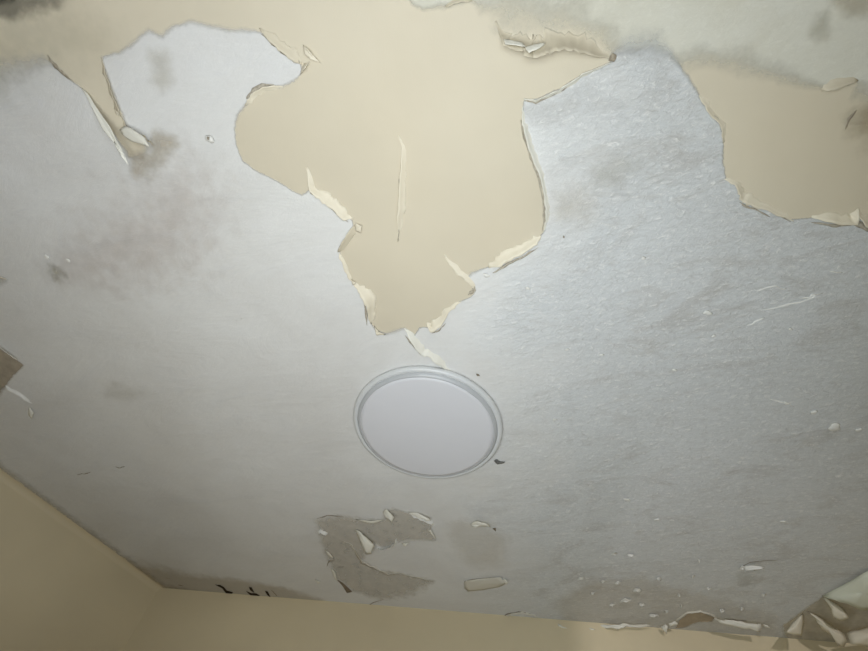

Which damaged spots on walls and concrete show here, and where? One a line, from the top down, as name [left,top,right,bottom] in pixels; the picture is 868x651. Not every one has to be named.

mould [0,0,55,17]
flaking render [495,0,868,93]
peeling [82,88,128,164]
peeling [100,56,154,147]
flaking render [305,167,353,221]
flaking render [520,107,550,233]
flaking render [811,208,868,228]
flaking render [488,235,541,268]
peeling [0,347,23,390]
peeling [6,385,32,404]
peeling [669,610,762,632]
peeling [784,571,868,647]